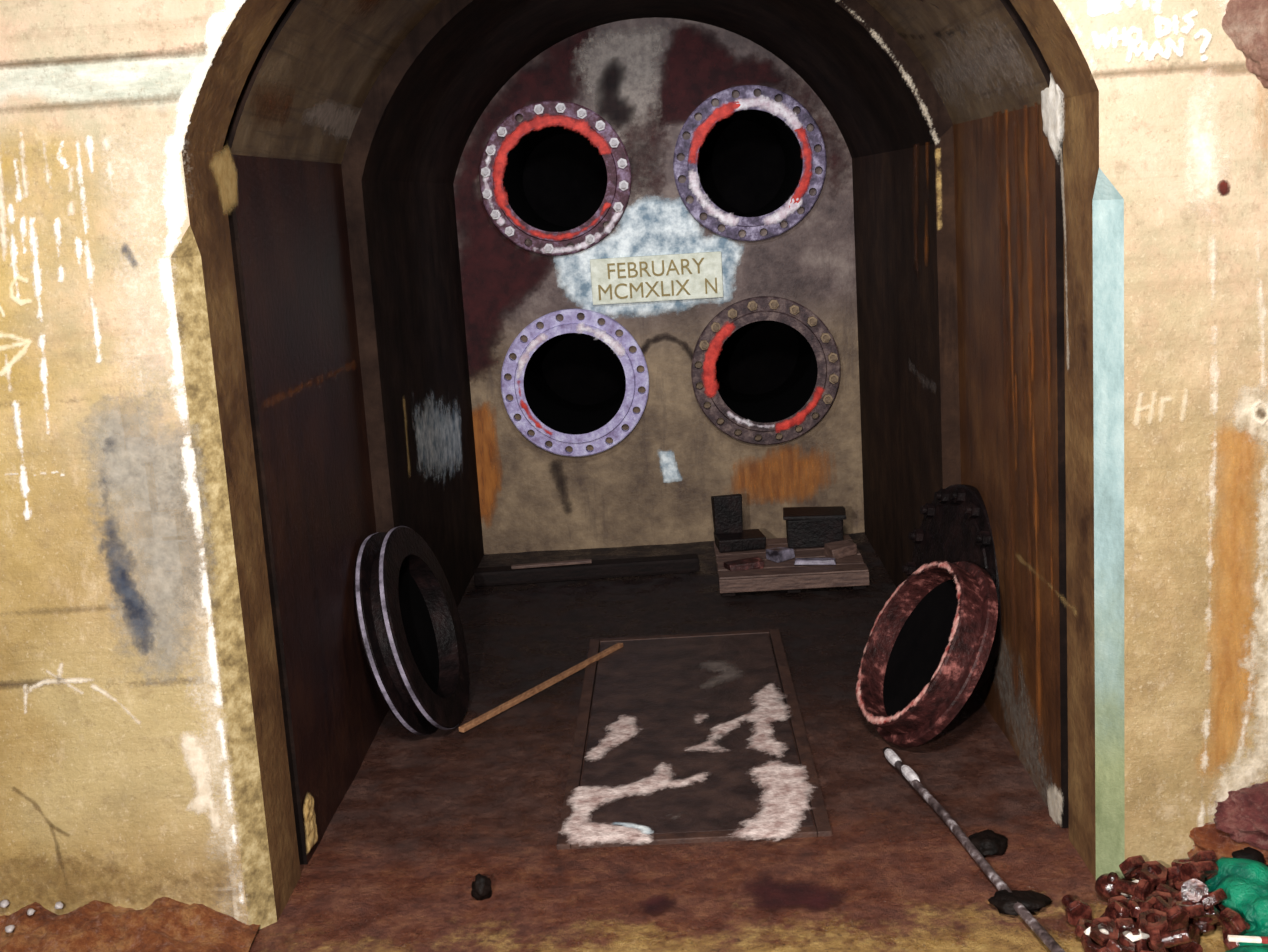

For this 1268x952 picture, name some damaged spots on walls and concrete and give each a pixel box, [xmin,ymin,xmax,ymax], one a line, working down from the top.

water stain [0,133,42,317]
water stain [46,136,113,278]
spalling [306,101,360,139]
water stain [453,26,849,378]
water stain [1187,86,1219,204]
water stain [5,361,23,451]
water stain [10,466,64,520]
water stain [38,335,49,433]
water stain [90,298,101,363]
water stain [98,410,204,666]
peeling [126,0,245,862]
corrosion [1215,433,1253,760]